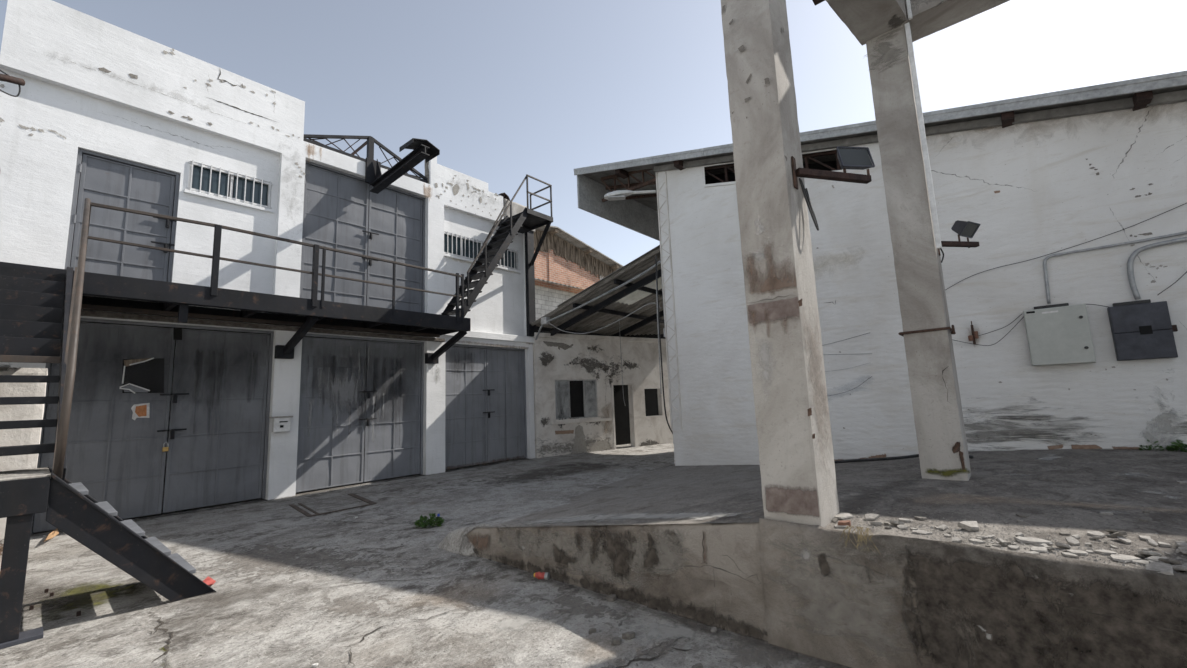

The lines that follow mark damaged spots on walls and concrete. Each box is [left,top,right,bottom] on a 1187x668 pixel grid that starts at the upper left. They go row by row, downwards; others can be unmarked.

peeling [543,341,573,350]
water stain [964,406,1085,460]
water stain [470,512,851,668]
crack [149,609,174,668]